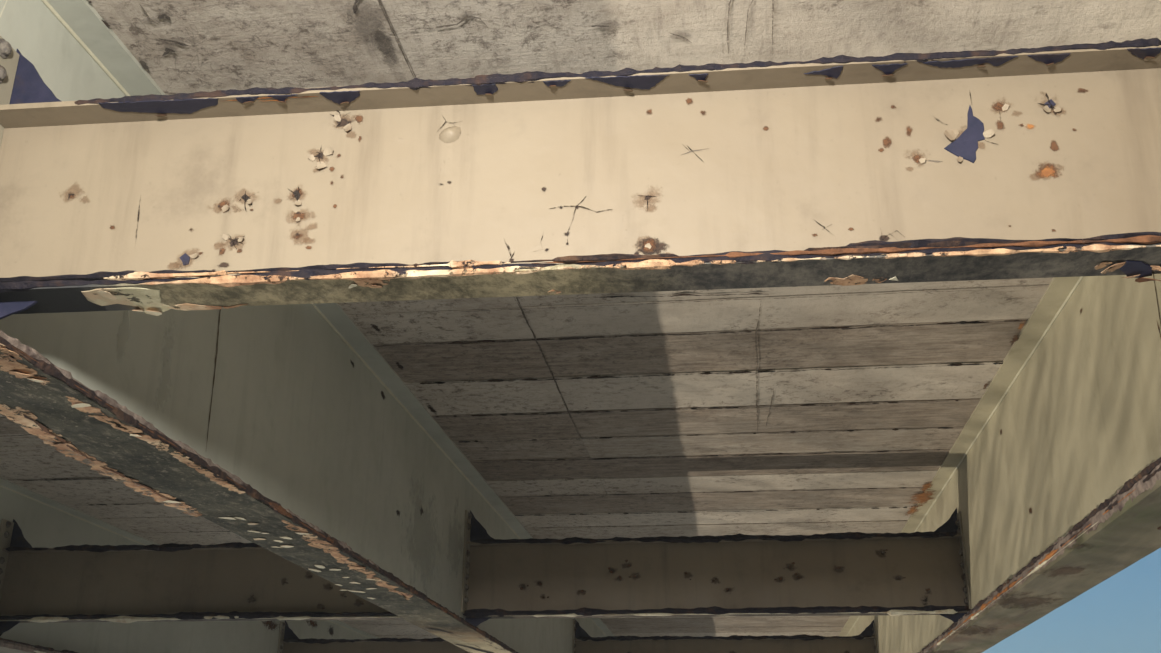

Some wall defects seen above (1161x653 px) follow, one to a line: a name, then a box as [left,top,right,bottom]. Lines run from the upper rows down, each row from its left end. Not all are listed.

peeling [98,98,219,117]
peeling [913,90,996,164]
rust [992,102,1009,129]
rust [1036,164,1058,177]
rust [293,212,311,249]
peeling [81,252,736,316]
rust [0,225,1161,292]
peeling [882,244,1161,259]
peeling [0,404,202,517]
peeling [66,396,246,494]
rust [0,330,1161,653]
peeling [218,517,413,606]